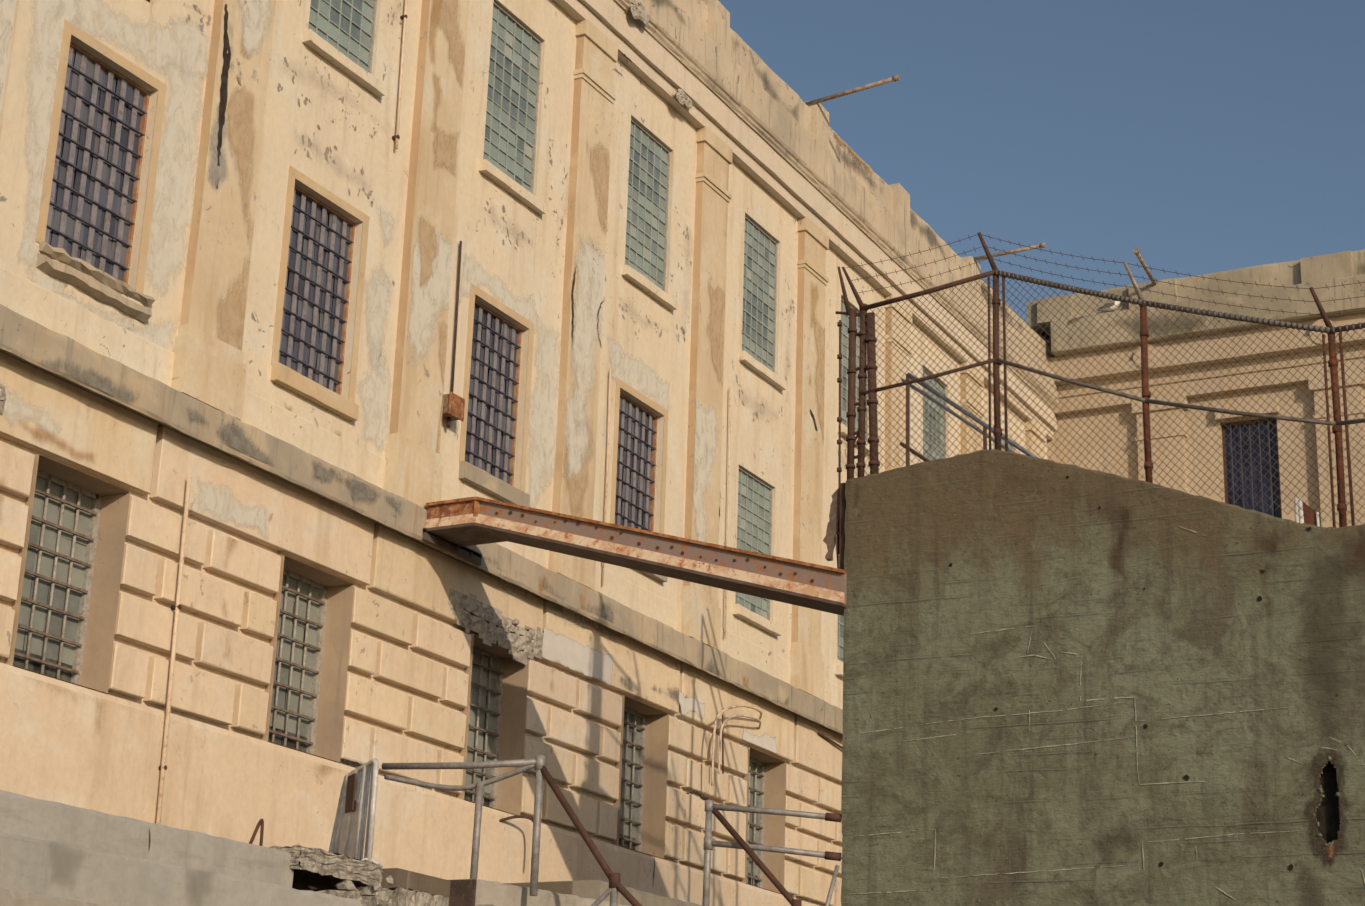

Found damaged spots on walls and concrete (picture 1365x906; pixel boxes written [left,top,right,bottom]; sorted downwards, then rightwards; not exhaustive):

crack [216,4,231,189]
peeling [19,0,226,353]
spalling [449,589,543,665]
peeling [498,578,528,592]
peeling [555,603,623,636]